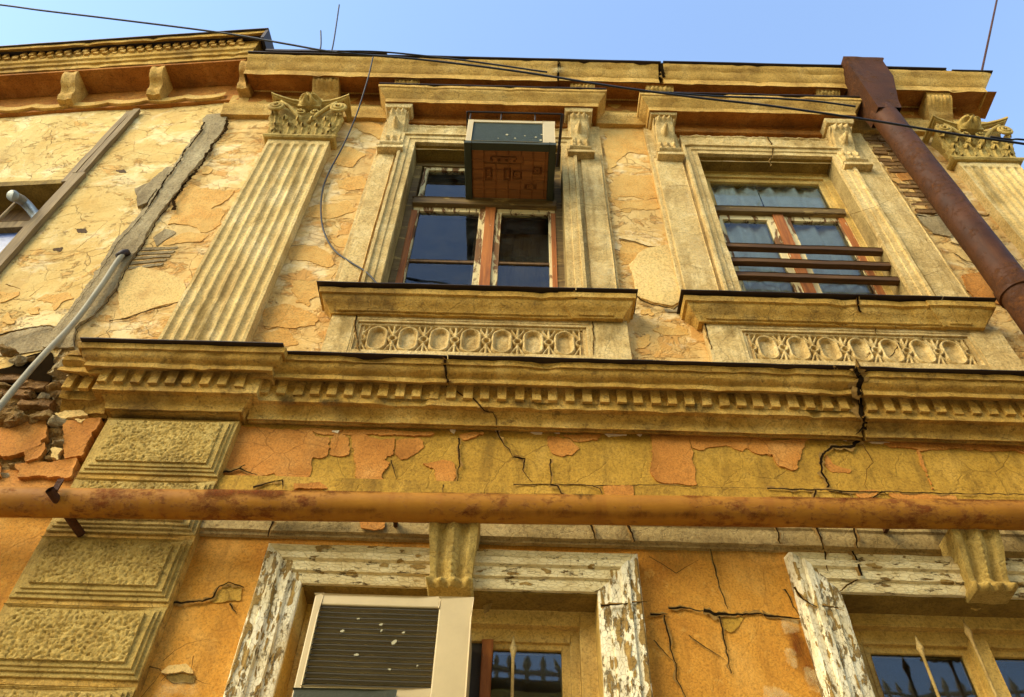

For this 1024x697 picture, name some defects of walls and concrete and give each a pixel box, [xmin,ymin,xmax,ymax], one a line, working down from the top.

flaking render [117,166,234,318]
flaking render [863,134,952,238]
peeling [0,343,104,481]
corrosion [207,489,323,497]
peeling [223,425,456,490]
peeling [530,432,807,486]
crack [441,295,1024,499]
crack [173,582,244,614]
peeling [225,551,299,697]
peeling [600,558,653,697]
crack [600,525,863,697]
peeling [793,562,865,697]